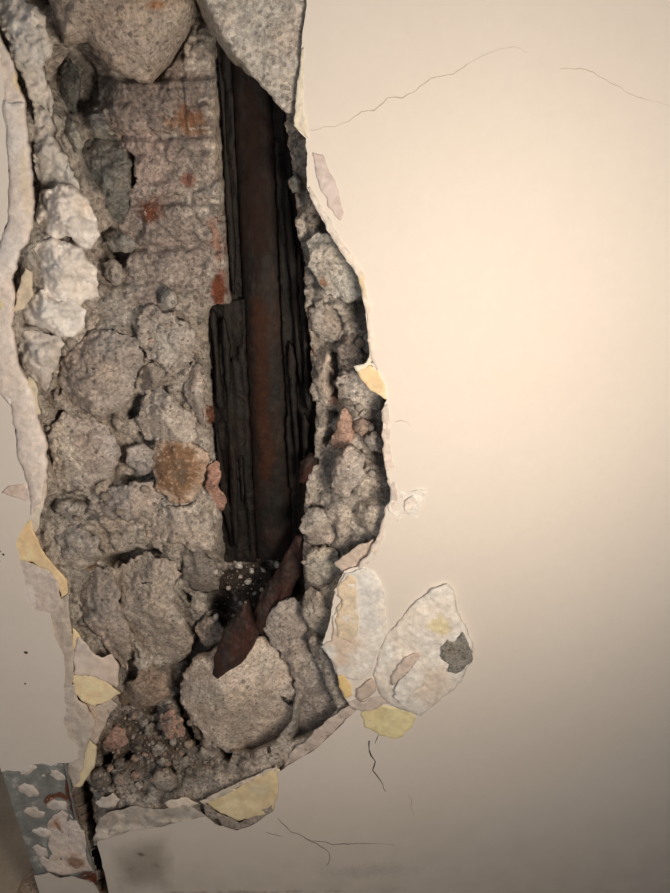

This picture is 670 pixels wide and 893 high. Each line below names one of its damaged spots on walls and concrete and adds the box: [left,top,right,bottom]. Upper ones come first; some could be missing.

crack [312,46,529,131]
corrosion [214,62,236,303]
corrosion [203,318,239,548]
spalling [0,0,473,886]
corrosion [44,781,78,819]
corrosion [69,858,108,893]
crack [266,819,392,866]
crack [368,736,386,792]